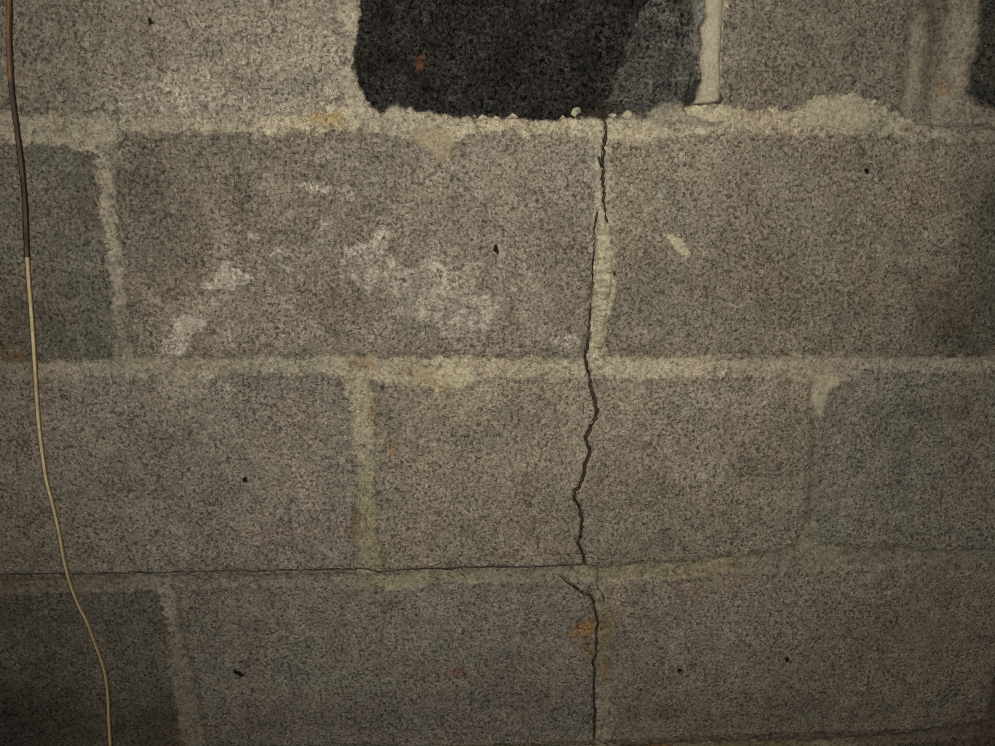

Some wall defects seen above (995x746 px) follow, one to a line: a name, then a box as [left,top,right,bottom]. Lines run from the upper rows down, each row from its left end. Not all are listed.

leakage [352,0,701,122]
crack [0,116,608,746]